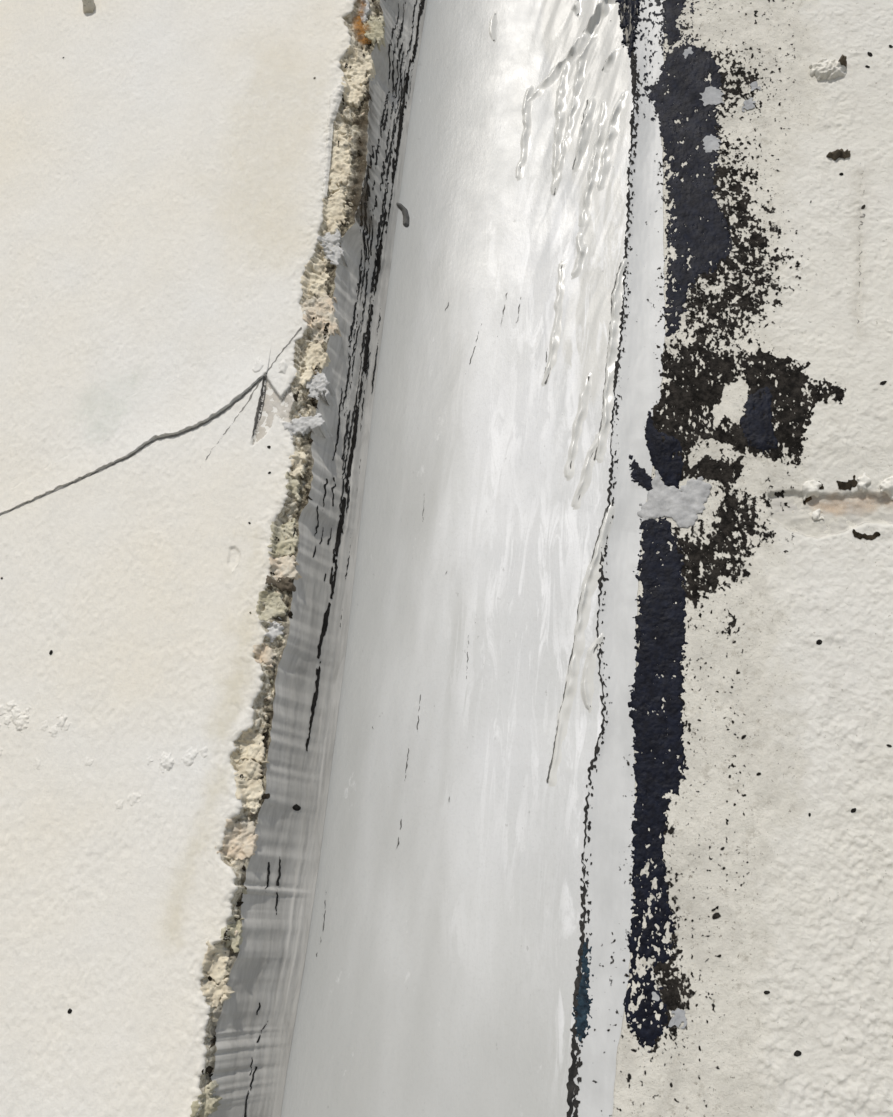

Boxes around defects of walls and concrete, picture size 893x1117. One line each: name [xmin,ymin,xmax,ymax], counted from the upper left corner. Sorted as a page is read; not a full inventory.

crack [0,327,302,516]
spalling [190,0,386,1117]